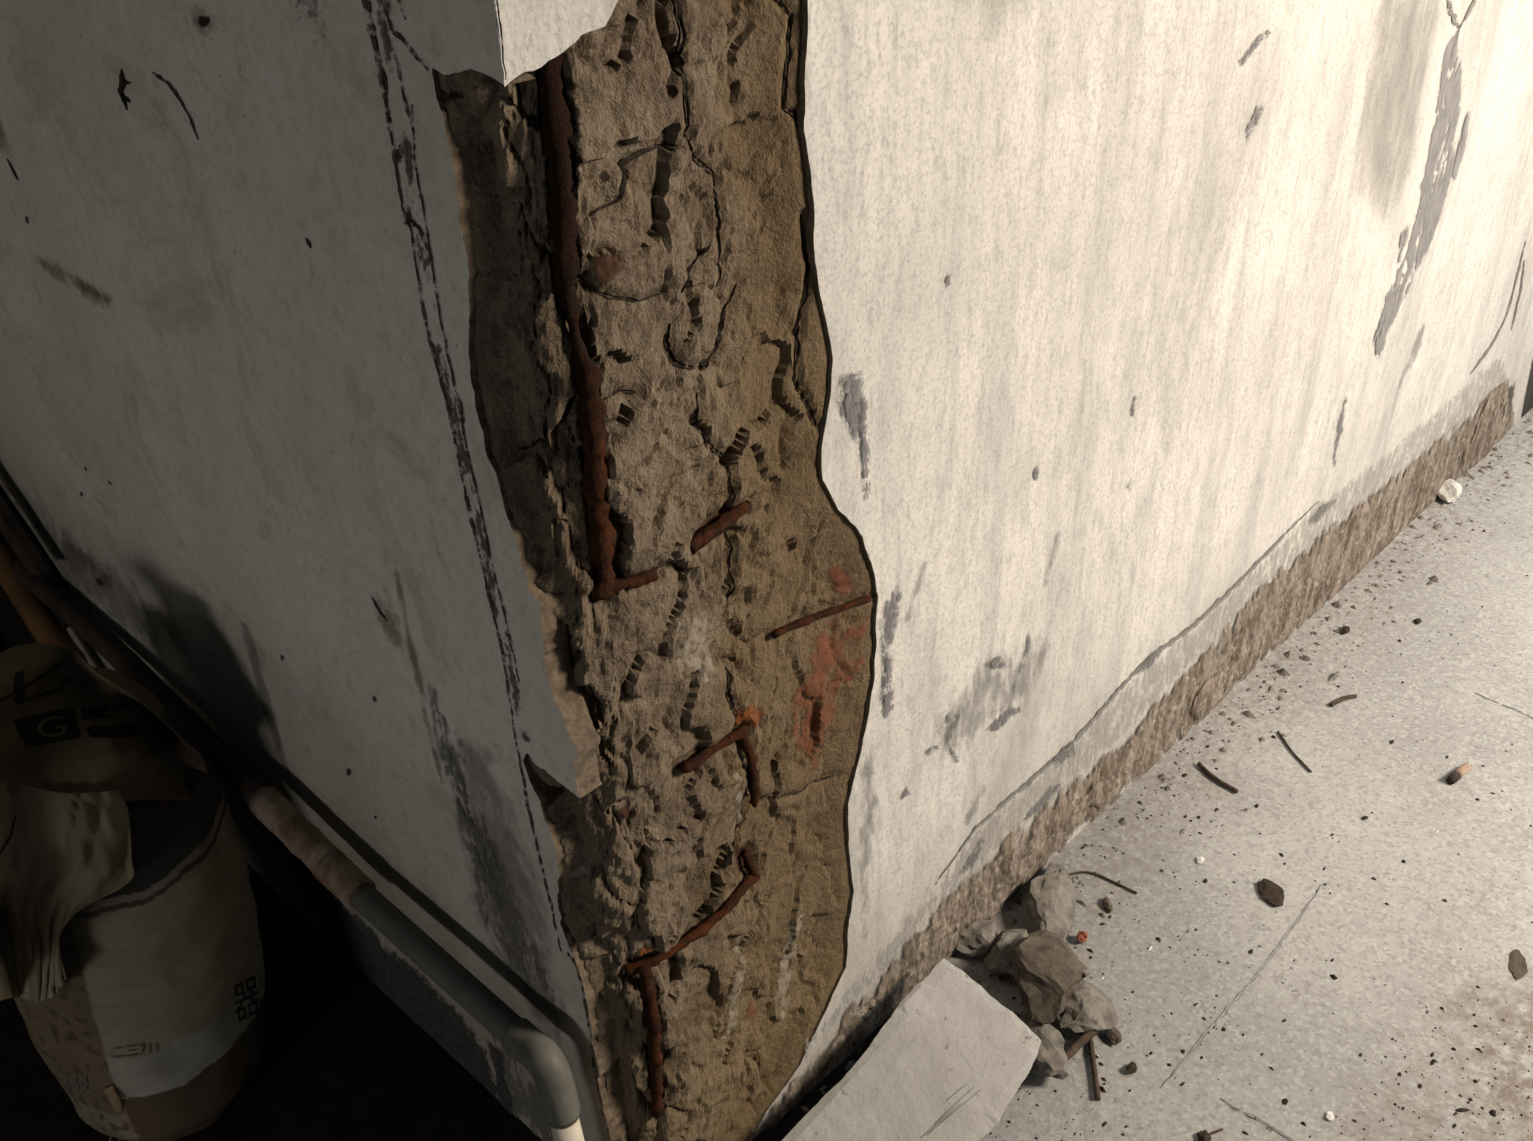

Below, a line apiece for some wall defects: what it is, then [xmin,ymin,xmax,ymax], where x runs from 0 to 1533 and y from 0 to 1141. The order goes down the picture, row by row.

peeling [376,0,392,72]
crack [1448,0,1476,58]
peeling [393,131,435,284]
rust [593,247,626,285]
crack [1470,241,1526,374]
crack [362,0,609,1137]
spalling [432,0,1515,1141]
damp [425,688,554,1006]